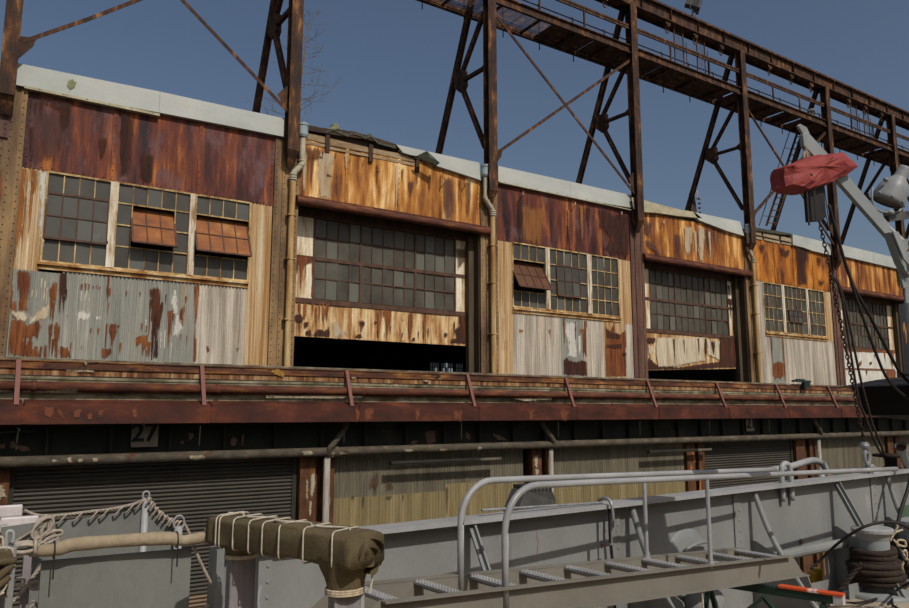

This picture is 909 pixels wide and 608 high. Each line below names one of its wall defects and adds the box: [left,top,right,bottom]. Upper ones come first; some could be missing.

corrosion [34,98,72,132]
corrosion [120,114,153,181]
corrosion [305,147,323,180]
corrosion [429,175,471,220]
corrosion [517,200,543,245]
corrosion [568,206,629,257]
corrosion [781,248,807,284]
corrosion [0,270,853,394]
peeling [565,322,581,358]
peeling [648,336,720,367]